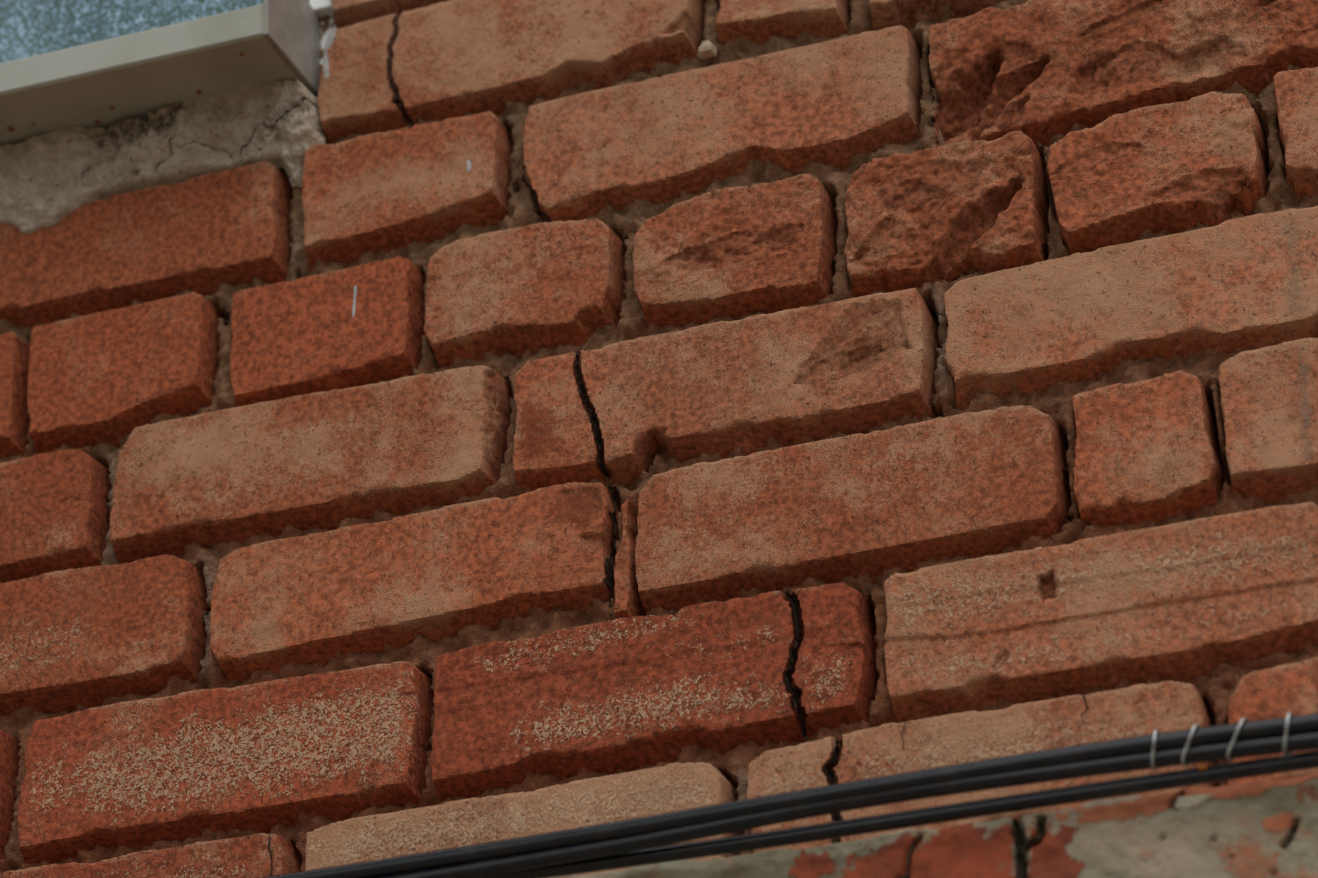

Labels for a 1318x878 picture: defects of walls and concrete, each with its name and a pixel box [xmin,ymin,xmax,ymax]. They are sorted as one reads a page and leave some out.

crack [387,0,416,128]
spalling [1078,0,1164,39]
spalling [1073,37,1246,95]
crack [155,96,317,172]
spalling [850,44,1050,281]
crack [575,350,617,620]
crack [784,590,840,843]
crack [1011,819,1044,878]
peeling [788,772,1318,878]